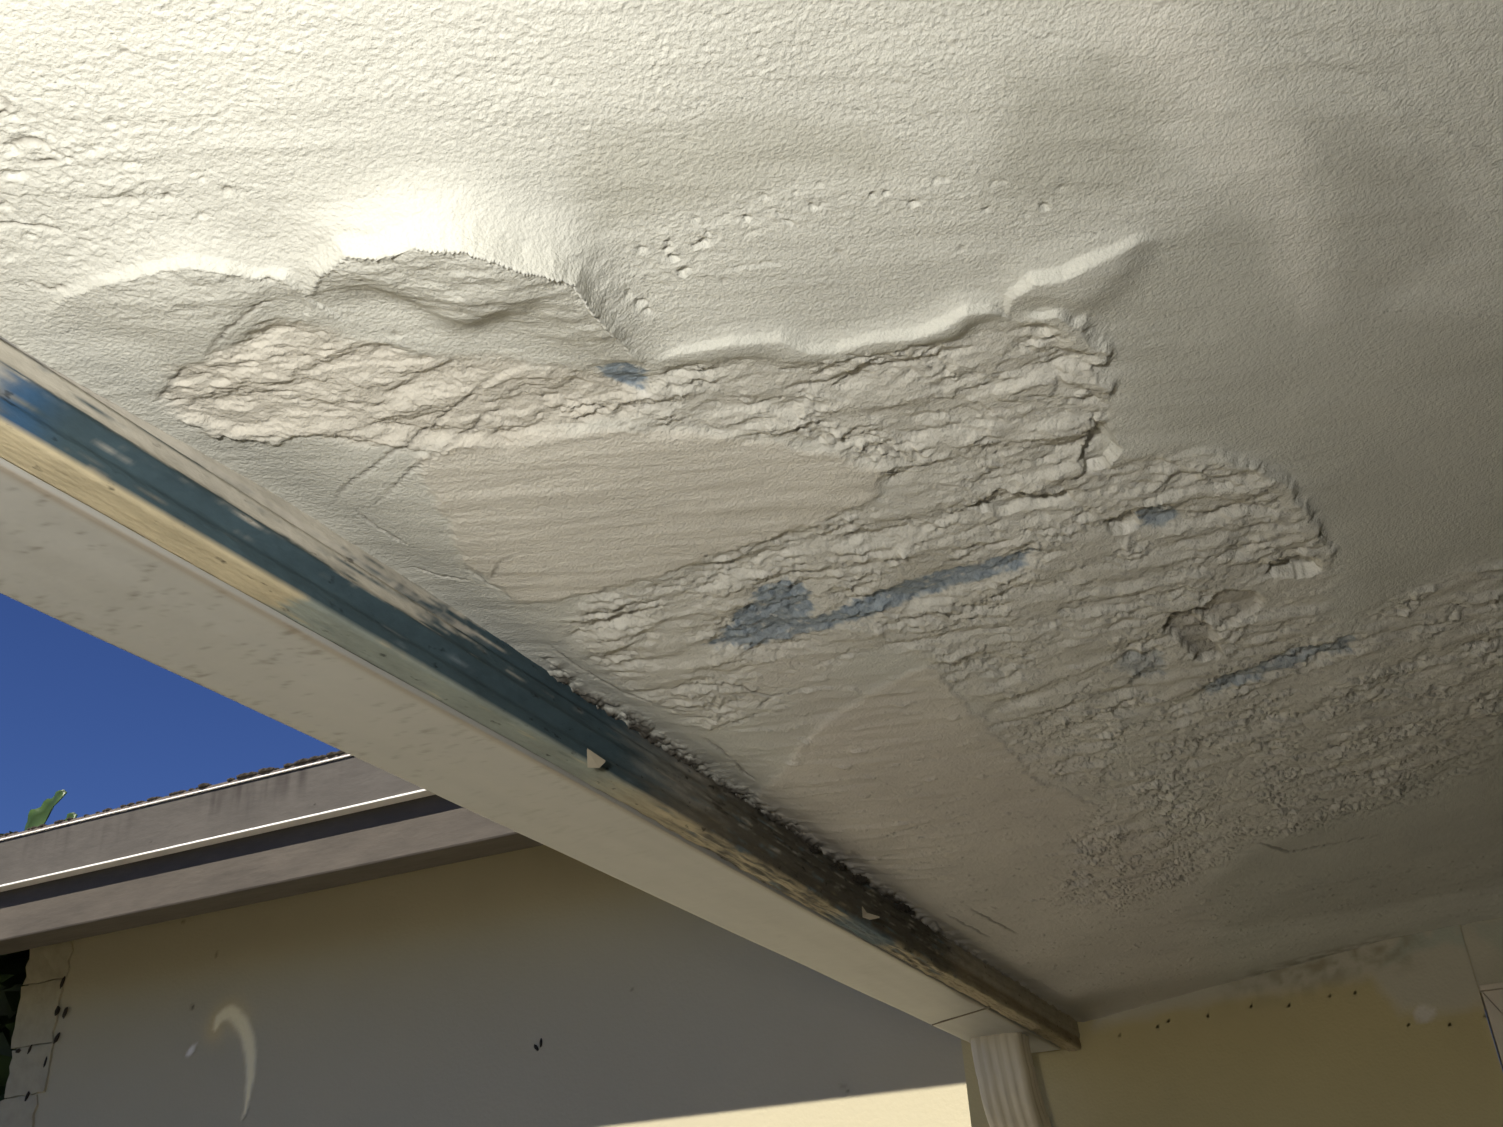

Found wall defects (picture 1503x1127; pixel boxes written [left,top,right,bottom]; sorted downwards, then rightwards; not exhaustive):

spalling [129,237,1503,914]
water stain [186,756,410,834]
water stain [529,649,1014,978]